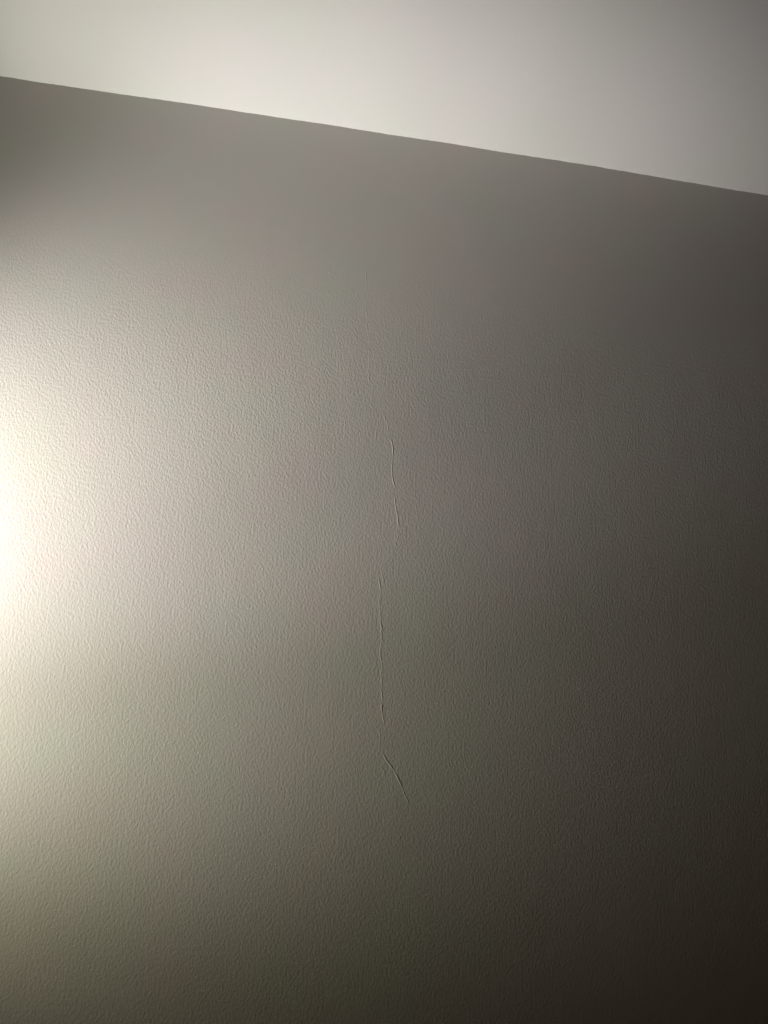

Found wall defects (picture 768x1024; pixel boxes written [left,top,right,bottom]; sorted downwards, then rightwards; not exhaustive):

crack [375,414,399,548]
crack [378,572,412,813]